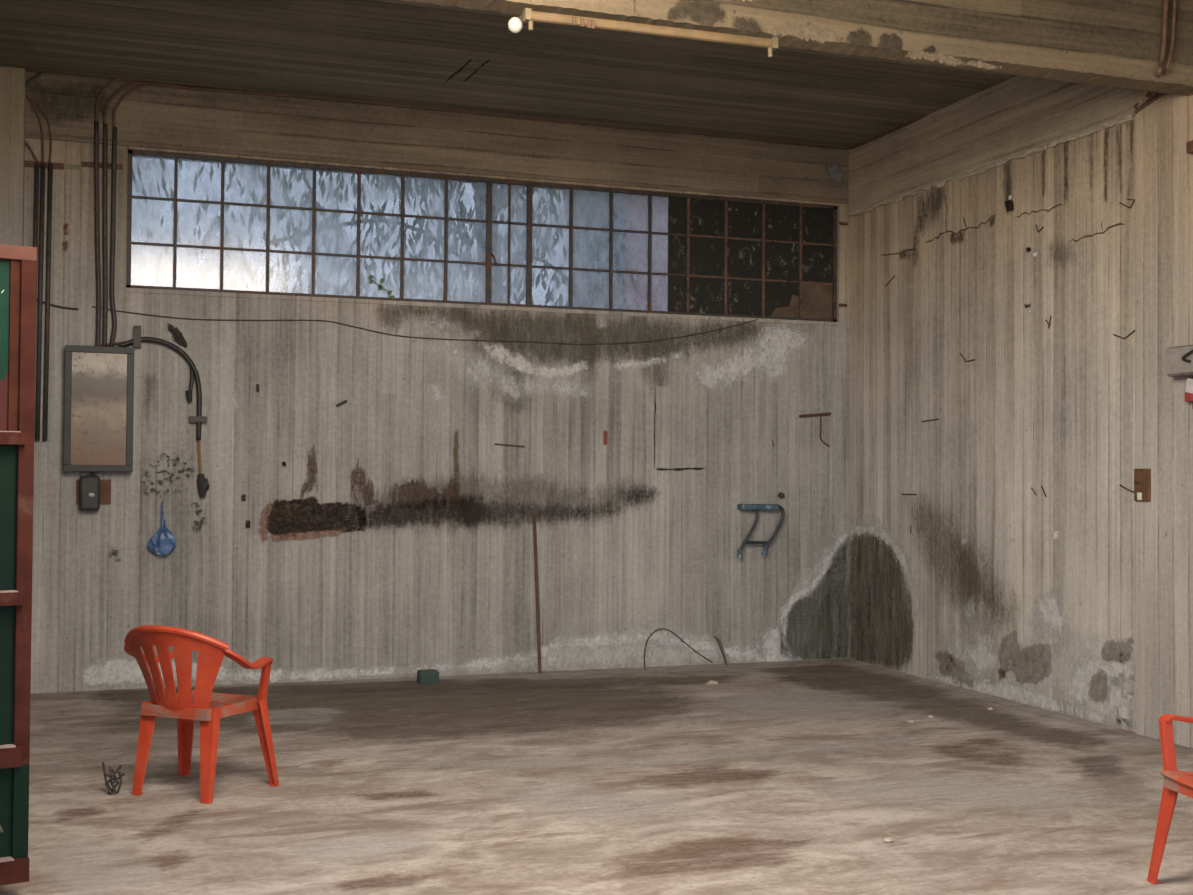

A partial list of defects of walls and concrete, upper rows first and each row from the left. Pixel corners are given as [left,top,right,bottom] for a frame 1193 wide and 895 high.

spalling [668,0,1002,70]
damp [383,306,812,401]
damp [351,461,461,510]
damp [82,658,178,727]
damp [212,516,1135,768]
spalling [936,651,973,688]
spalling [998,631,1051,684]
spalling [1089,638,1133,702]
damp [821,772,1103,808]